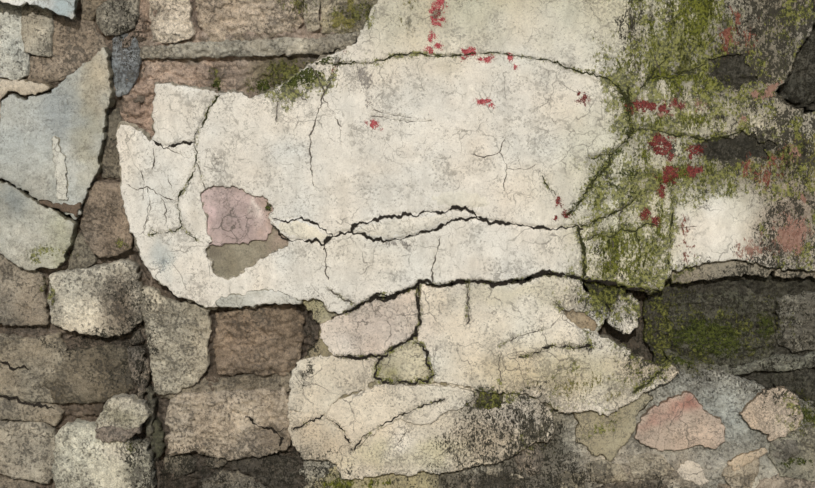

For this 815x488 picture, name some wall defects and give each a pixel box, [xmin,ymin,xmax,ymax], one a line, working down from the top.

peeling [0,0,82,20]
leakage [625,0,673,60]
crack [128,95,220,242]
spalling [109,49,340,138]
leakage [603,115,666,241]
leakage [677,111,728,130]
leakage [751,125,786,153]
spalling [201,186,288,278]
crack [245,49,744,450]
spalling [198,288,320,391]
peeling [326,337,506,450]
spalling [438,366,815,488]